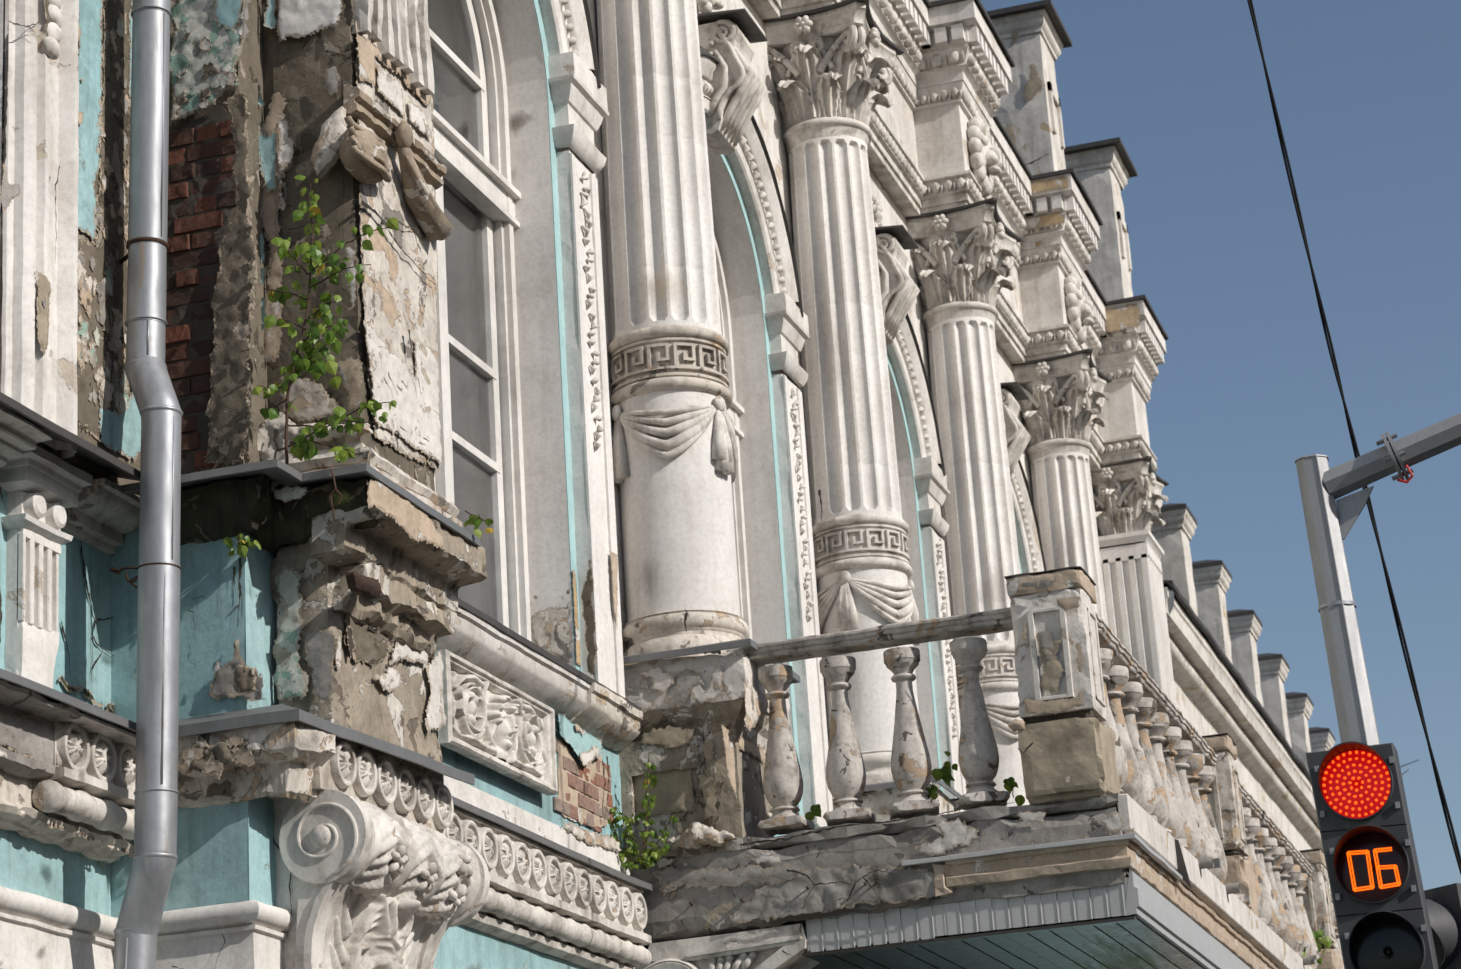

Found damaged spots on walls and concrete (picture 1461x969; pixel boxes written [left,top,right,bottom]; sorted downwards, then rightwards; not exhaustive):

crack [0,21,40,242]
spalling [77,0,141,462]
flaking render [165,0,443,474]
peeling [270,481,307,502]
peeling [367,480,445,550]
crack [61,541,113,682]
spalling [178,734,261,798]
peeling [207,565,447,737]
flaking render [553,713,622,853]
spalling [625,651,727,713]
peeling [744,683,769,731]
peeling [1017,811,1046,823]